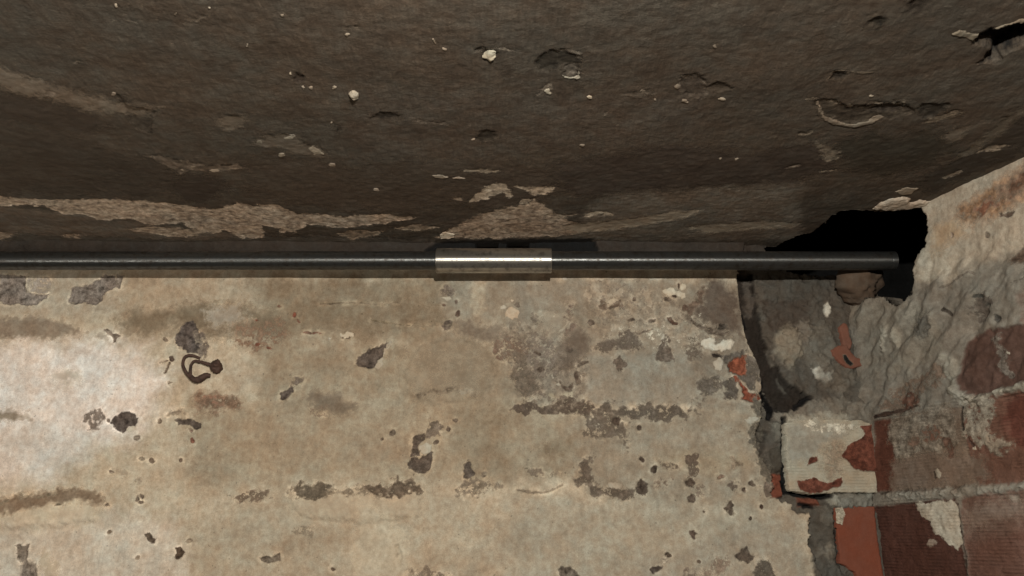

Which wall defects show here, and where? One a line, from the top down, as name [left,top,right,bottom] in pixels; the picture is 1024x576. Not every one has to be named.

spalling [951,19,1024,60]
spalling [534,49,583,79]
peeling [814,99,916,127]
peeling [0,169,414,240]
peeling [469,183,513,202]
peeling [435,198,577,240]
peeling [514,183,555,197]
peeling [563,210,699,233]
peeling [689,220,796,233]
peeling [873,197,931,211]
spalling [873,372,930,419]
peeling [842,424,877,472]